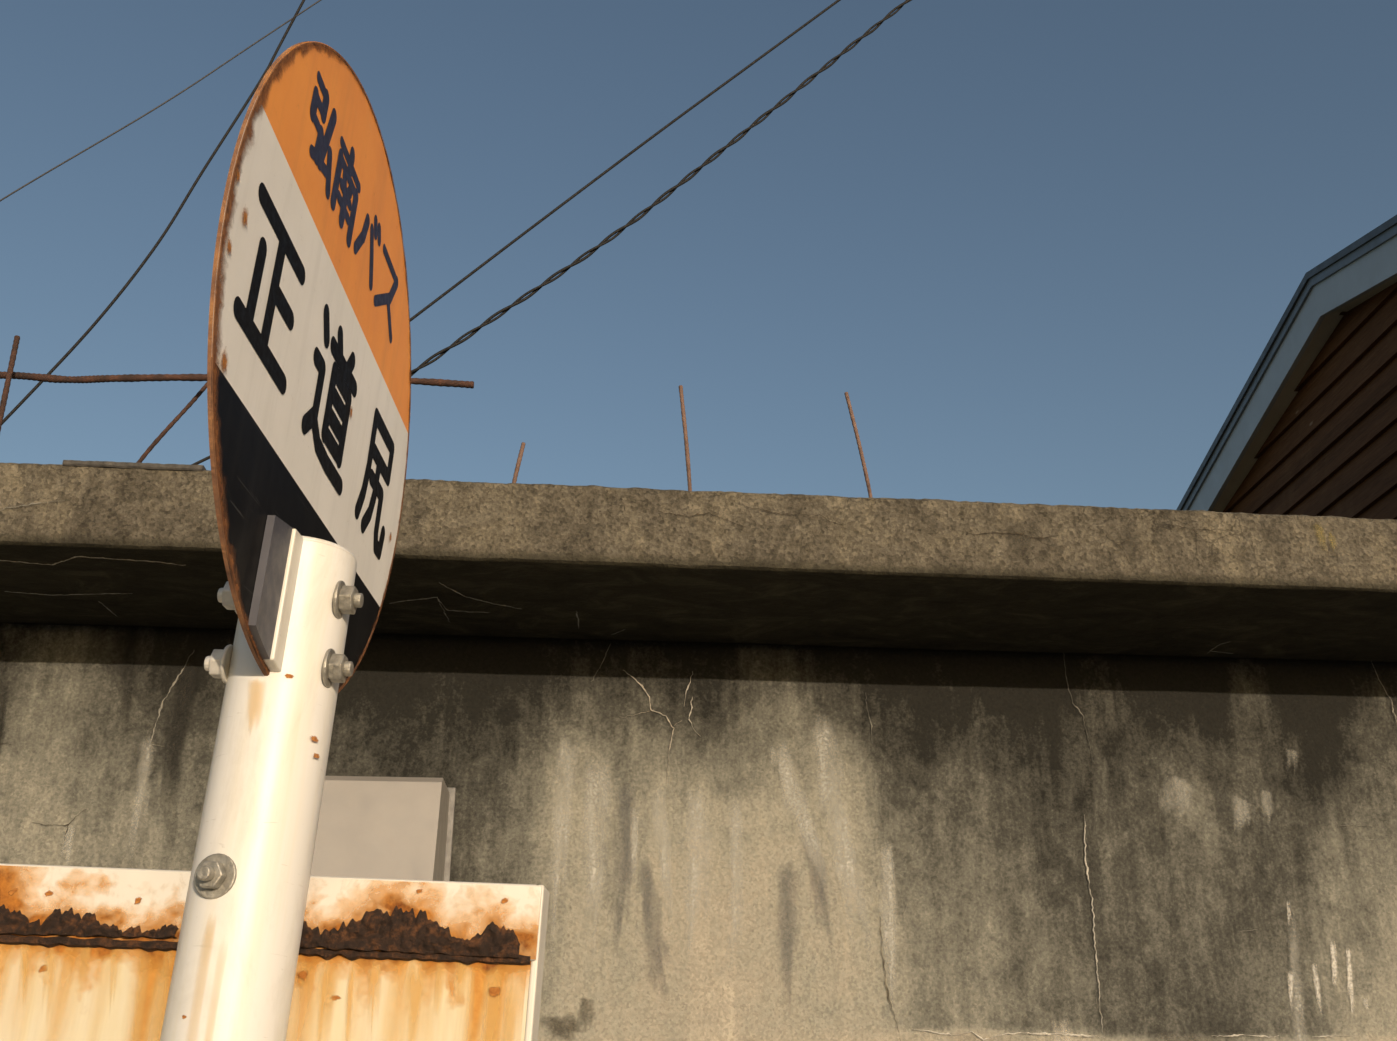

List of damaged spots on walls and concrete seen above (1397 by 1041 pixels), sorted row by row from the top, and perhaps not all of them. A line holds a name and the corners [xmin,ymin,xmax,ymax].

crack [0,556,177,614]
damp [166,656,198,775]
crack [592,629,700,777]
crack [880,814,1104,1041]
crack [1213,1032,1279,1040]
damp [1313,946,1353,1011]